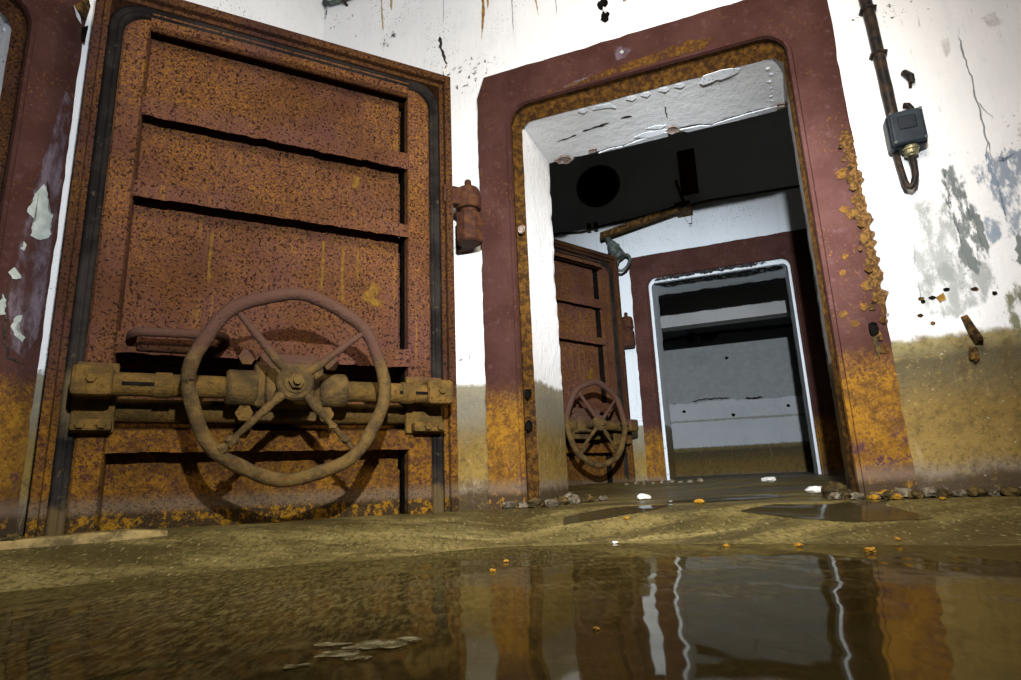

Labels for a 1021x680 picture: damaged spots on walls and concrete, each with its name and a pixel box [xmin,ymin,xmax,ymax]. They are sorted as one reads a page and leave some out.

rust [545,37,711,93]
crack [959,39,993,160]
peeling [0,116,66,364]
rust [600,180,693,240]
rust [835,128,890,353]
damp [913,149,1021,317]
damp [891,285,1021,497]